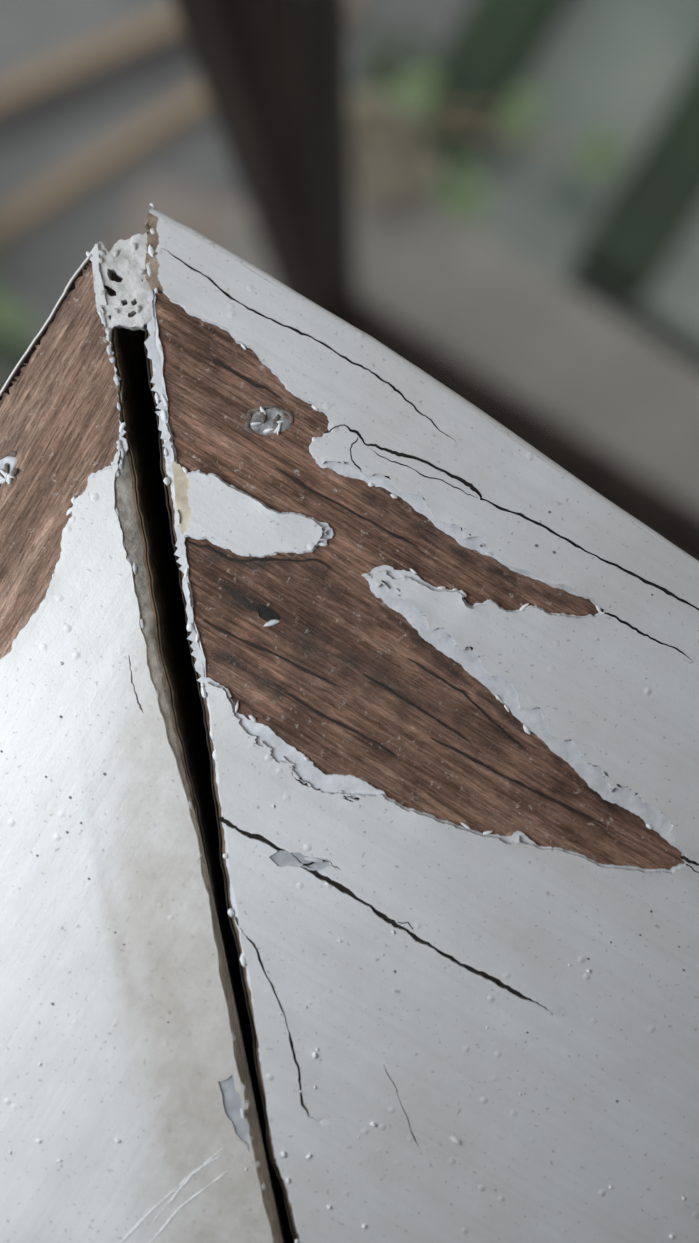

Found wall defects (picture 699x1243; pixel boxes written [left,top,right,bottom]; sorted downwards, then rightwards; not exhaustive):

peeling [0,251,129,660]
crack [164,249,451,438]
crack [114,325,546,1243]
peeling [144,203,686,873]
crack [325,424,699,610]
crack [601,609,691,660]